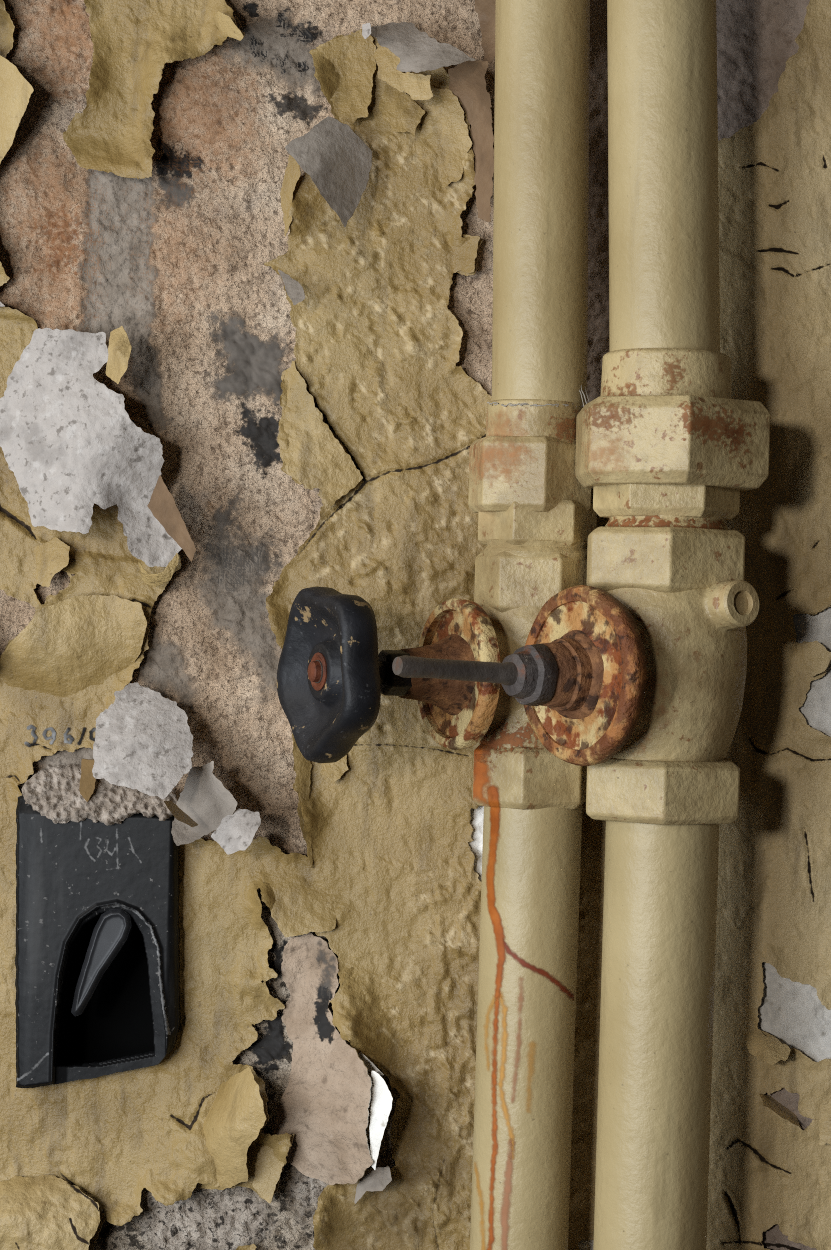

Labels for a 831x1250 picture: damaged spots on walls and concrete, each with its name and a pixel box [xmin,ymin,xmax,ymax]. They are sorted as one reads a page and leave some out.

crack [768,200,789,209]
crack [758,248,830,277]
corrosion [548,377,651,444]
corrosion [661,353,755,455]
crack [0,505,36,539]
corrosion [607,515,725,529]
peeling [0,0,496,1250]
peeling [793,607,831,737]
corrosion [473,722,574,1250]
peeling [745,962,831,1065]
crack [726,1139,791,1174]
crack [722,1191,801,1250]